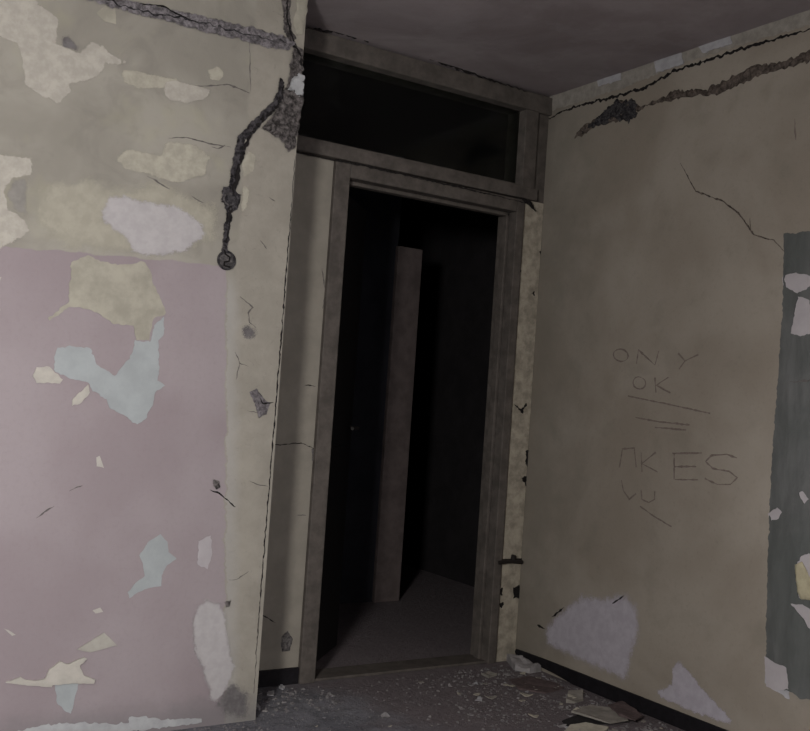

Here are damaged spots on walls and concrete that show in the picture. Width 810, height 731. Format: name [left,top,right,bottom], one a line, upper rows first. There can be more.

peeling [0,0,223,104]
crack [88,0,368,93]
crack [433,60,526,92]
crack [549,28,810,119]
crack [173,137,229,149]
spalling [221,45,305,251]
peeling [0,155,33,249]
crack [680,163,784,251]
peeling [33,255,166,424]
peeling [782,273,810,336]
peeling [6,633,202,731]
peeling [764,656,790,699]